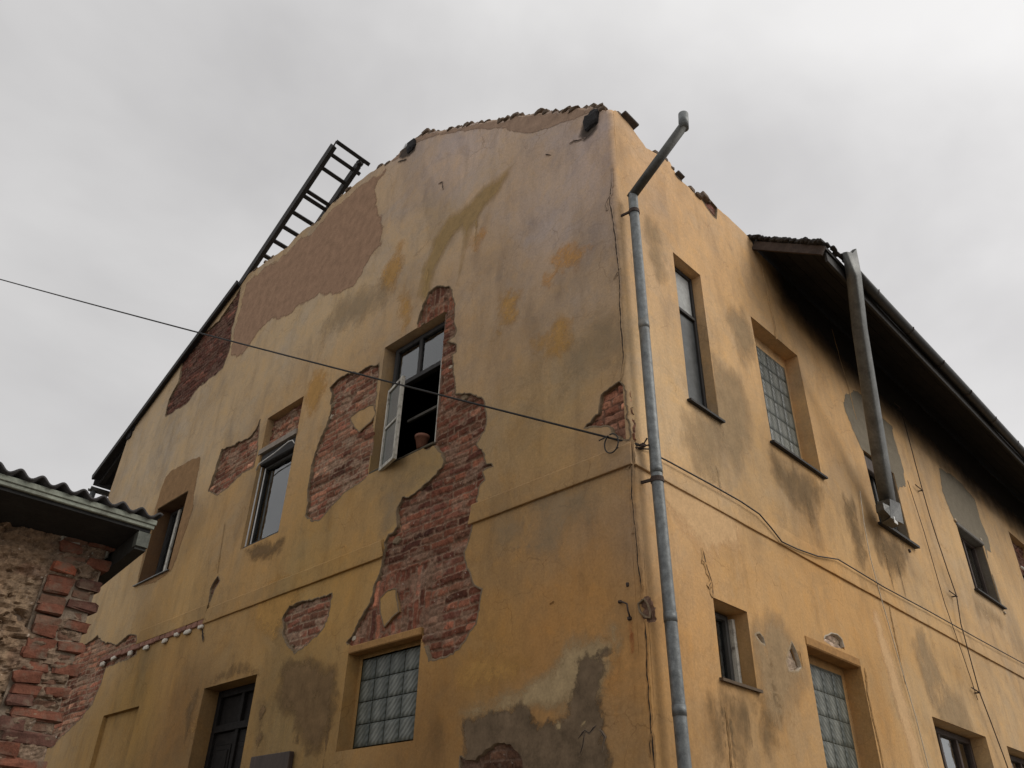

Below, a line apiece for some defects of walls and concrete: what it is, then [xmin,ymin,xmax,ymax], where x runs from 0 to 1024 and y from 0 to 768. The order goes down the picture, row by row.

leakage [422,176,504,297]
crack [604,167,626,380]
spalling [165,287,241,417]
spalling [208,419,261,496]
spalling [305,363,380,522]
spalling [346,285,494,662]
spalling [583,381,636,442]
spalling [51,619,204,748]
spalling [282,593,333,654]
spalling [459,742,523,768]
leakage [462,626,620,768]
crack [626,440,656,768]